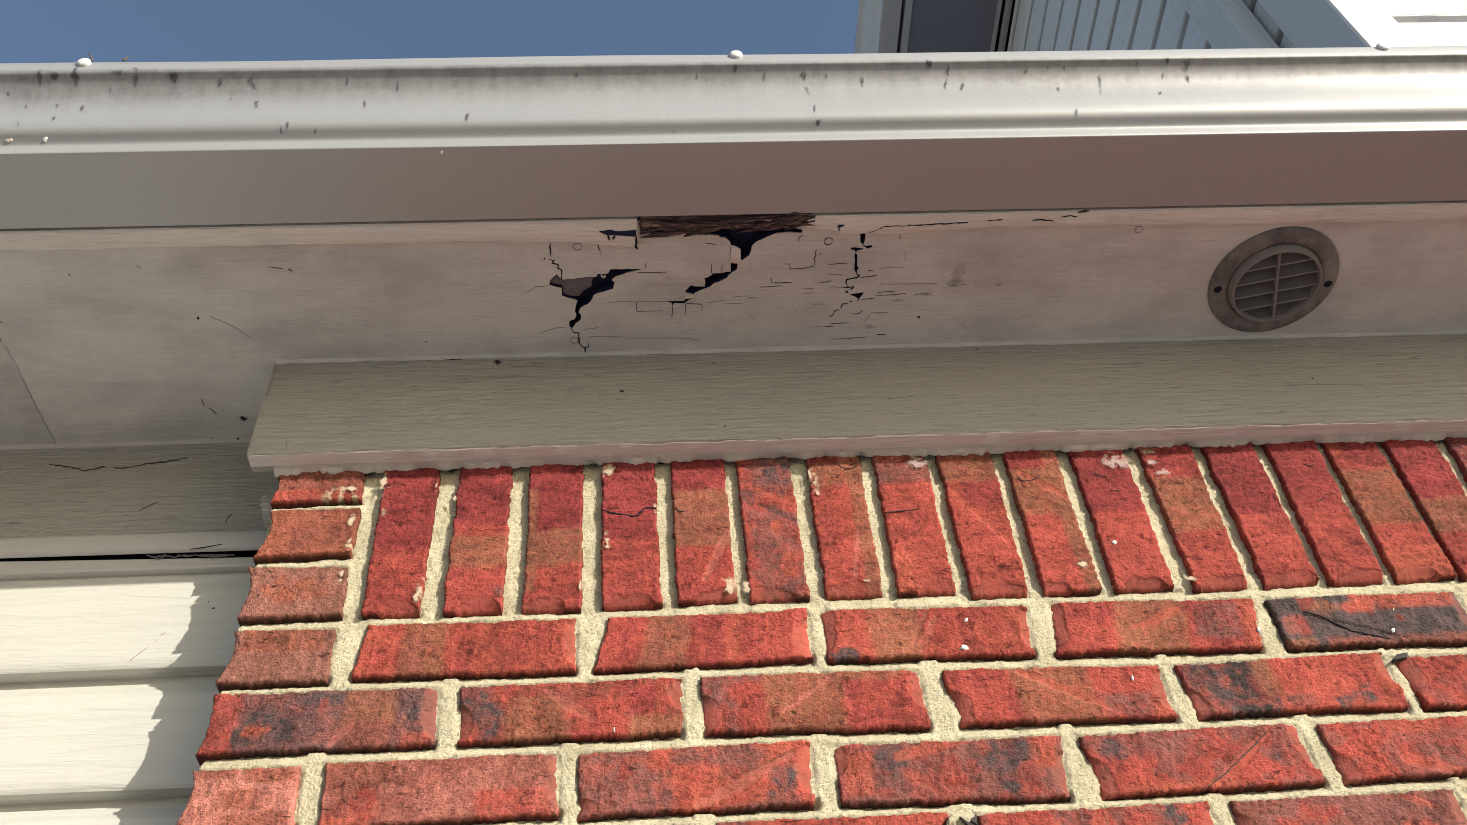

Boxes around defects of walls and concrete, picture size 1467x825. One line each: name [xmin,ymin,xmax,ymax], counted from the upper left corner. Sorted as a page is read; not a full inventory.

crack [583,310,662,339]
spalling [527,228,804,352]
crack [708,210,1089,339]